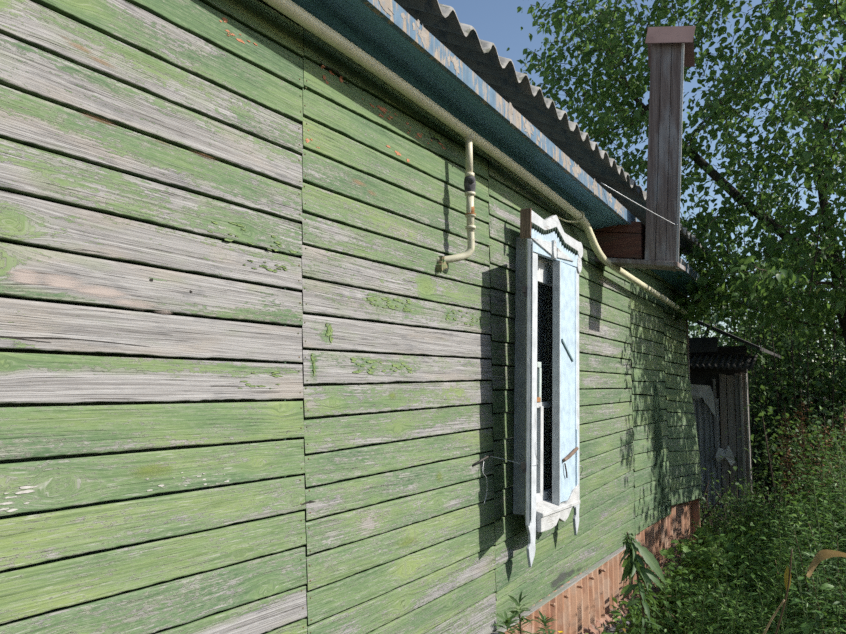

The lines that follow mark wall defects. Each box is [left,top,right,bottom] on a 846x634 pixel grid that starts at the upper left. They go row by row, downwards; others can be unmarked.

peeling [379,0,427,49]
peeling [447,54,459,76]
peeling [508,102,540,142]
peeling [10,269,148,307]
water stain [652,376,668,512]
peeling [0,486,37,512]